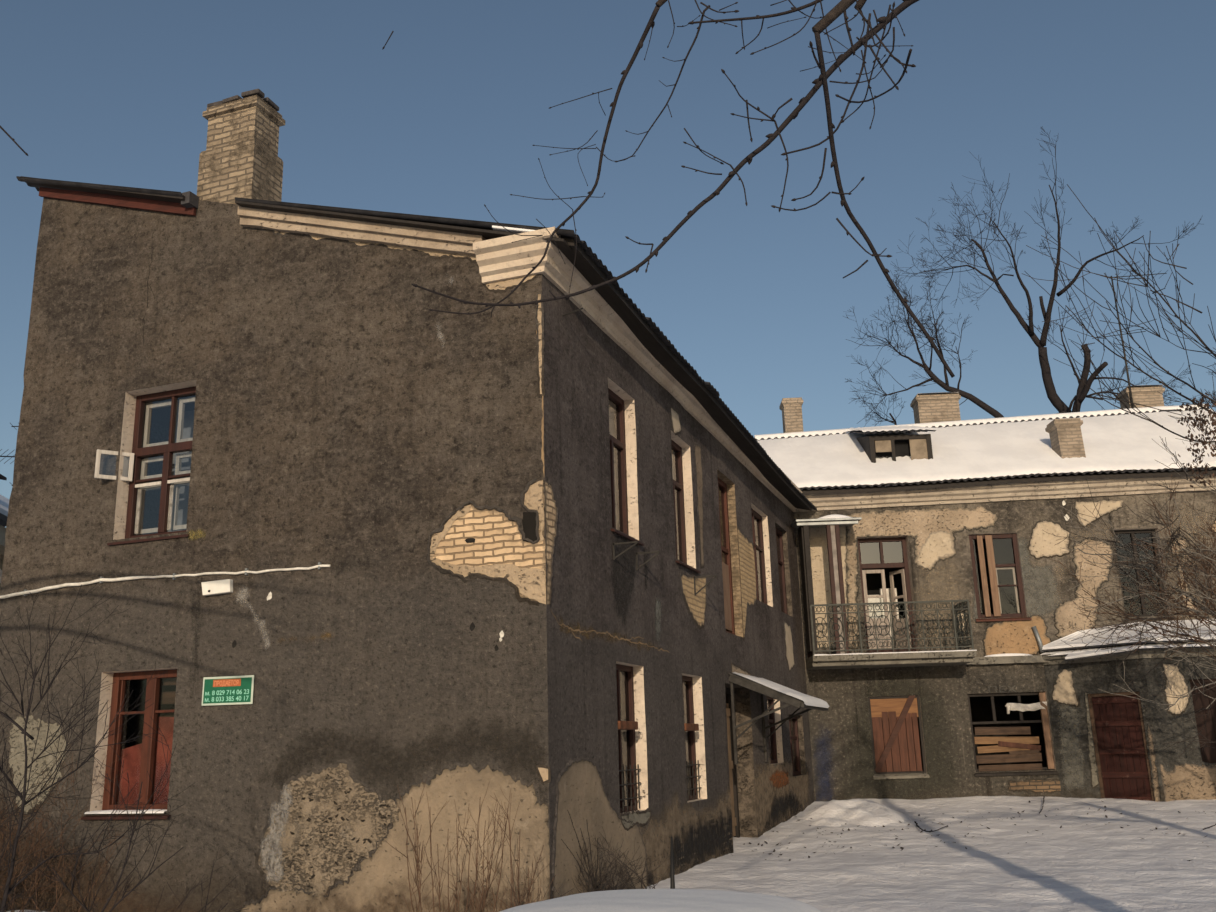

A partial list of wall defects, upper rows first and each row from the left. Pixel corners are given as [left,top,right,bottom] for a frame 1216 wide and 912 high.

flaking render [427,478,558,606]
spalling [809,506,999,649]
spalling [982,500,1123,657]
flaking render [5,711,70,817]
water stain [261,726,544,881]
spalling [242,757,652,912]
spalling [1051,668,1099,789]
spalling [1161,662,1191,716]
spalling [1146,723,1216,802]